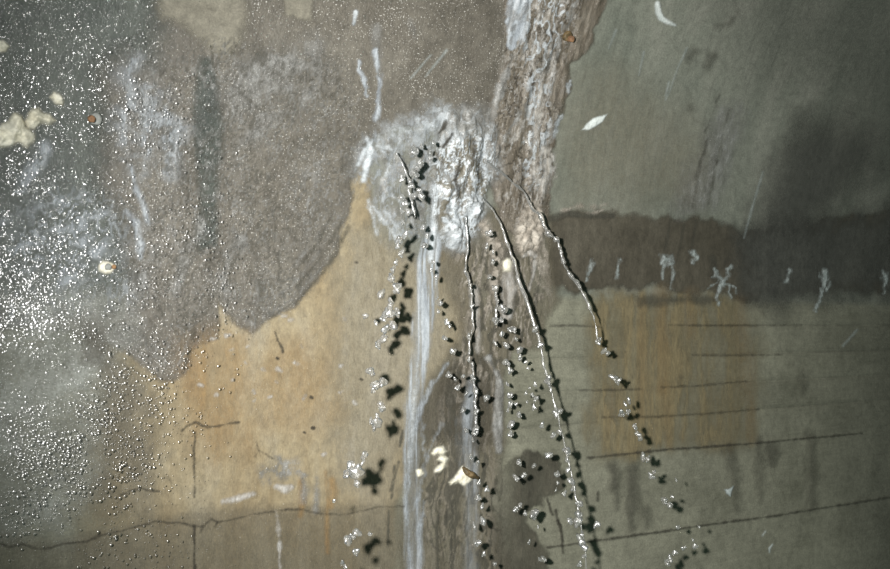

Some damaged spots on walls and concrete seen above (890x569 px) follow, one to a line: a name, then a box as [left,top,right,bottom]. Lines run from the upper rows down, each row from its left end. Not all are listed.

leakage [530,2,561,82]
leakage [510,86,544,190]
peeling [536,146,555,187]
leakage [408,176,441,383]
rust [99,166,463,569]
peeling [432,446,448,472]
peeling [450,466,472,485]
crack [547,500,563,550]